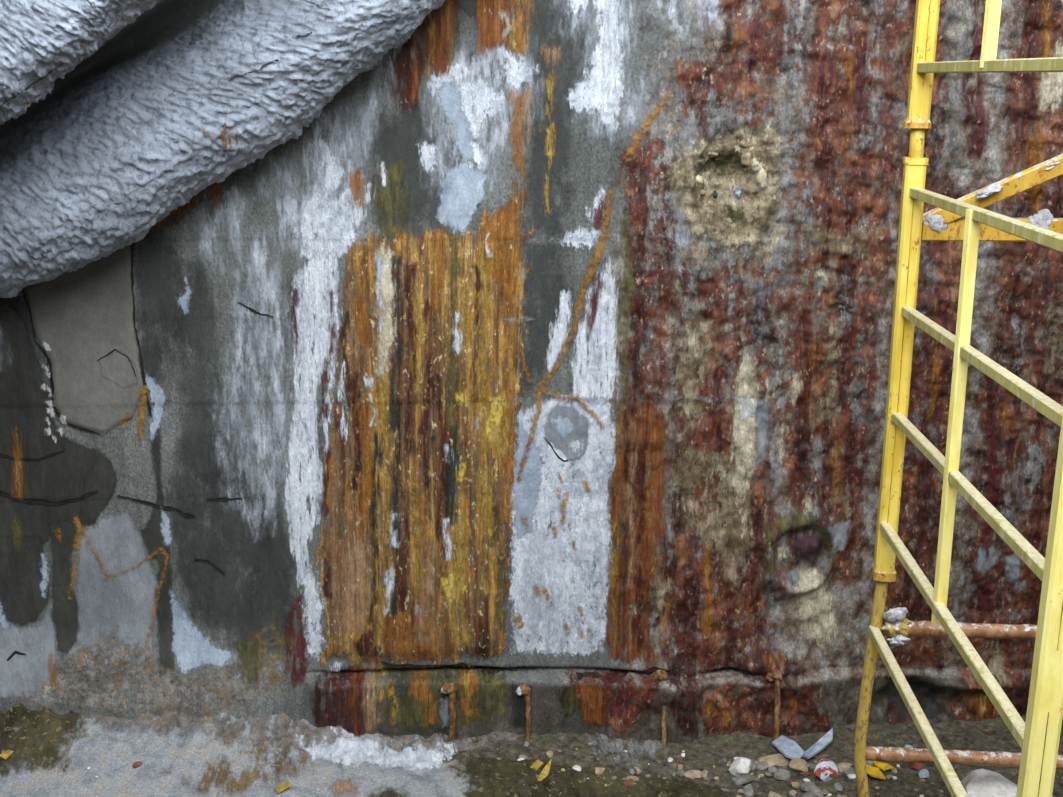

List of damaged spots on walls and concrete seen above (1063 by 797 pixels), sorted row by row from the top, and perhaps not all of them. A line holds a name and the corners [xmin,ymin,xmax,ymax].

leakage [858,0,885,149]
spalling [669,118,783,259]
crack [0,288,100,461]
crack [97,242,151,416]
leakage [0,0,873,708]
rust [238,0,916,738]
rust [916,241,963,335]
crack [0,490,242,517]
rust [872,326,954,621]
rust [969,375,1061,558]
leakage [295,726,463,772]
crack [381,662,537,683]